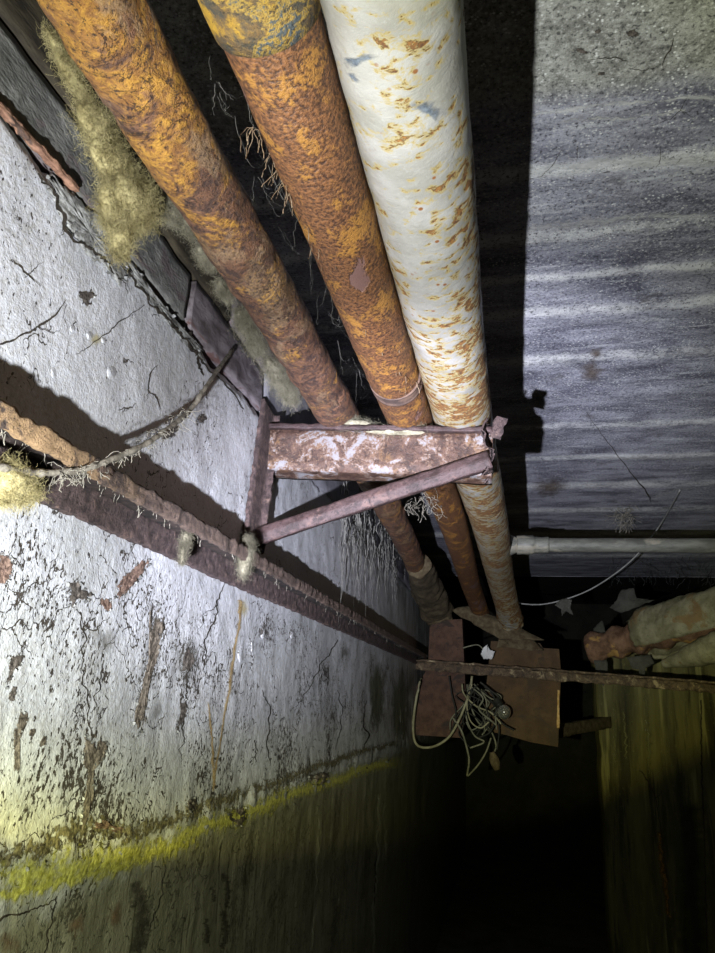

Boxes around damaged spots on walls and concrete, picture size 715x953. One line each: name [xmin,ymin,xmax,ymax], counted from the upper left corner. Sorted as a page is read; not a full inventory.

crack [0,300,66,345]
crack [38,173,243,414]
peeling [0,552,14,584]
peeling [65,559,152,612]
crack [79,612,108,736]
crack [178,582,225,762]
corrosion [208,600,246,791]
crack [254,640,370,764]
water stain [0,759,394,901]
crack [0,896,57,953]
water stain [130,882,150,953]